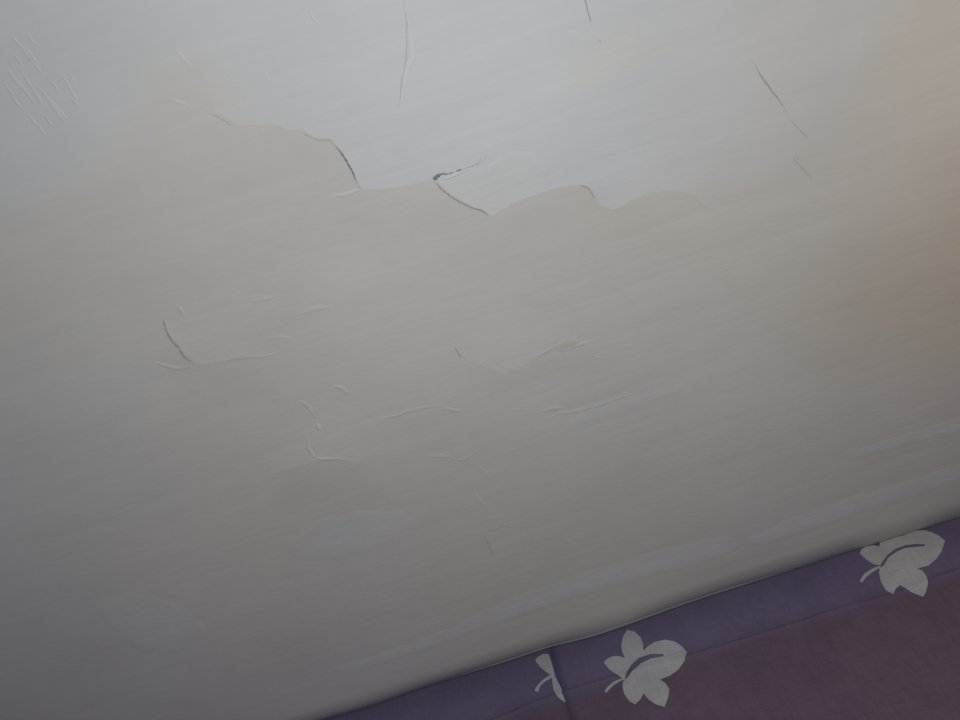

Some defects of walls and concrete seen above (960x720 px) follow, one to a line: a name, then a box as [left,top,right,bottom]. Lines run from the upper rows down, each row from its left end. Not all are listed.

peeling [0,0,931,281]